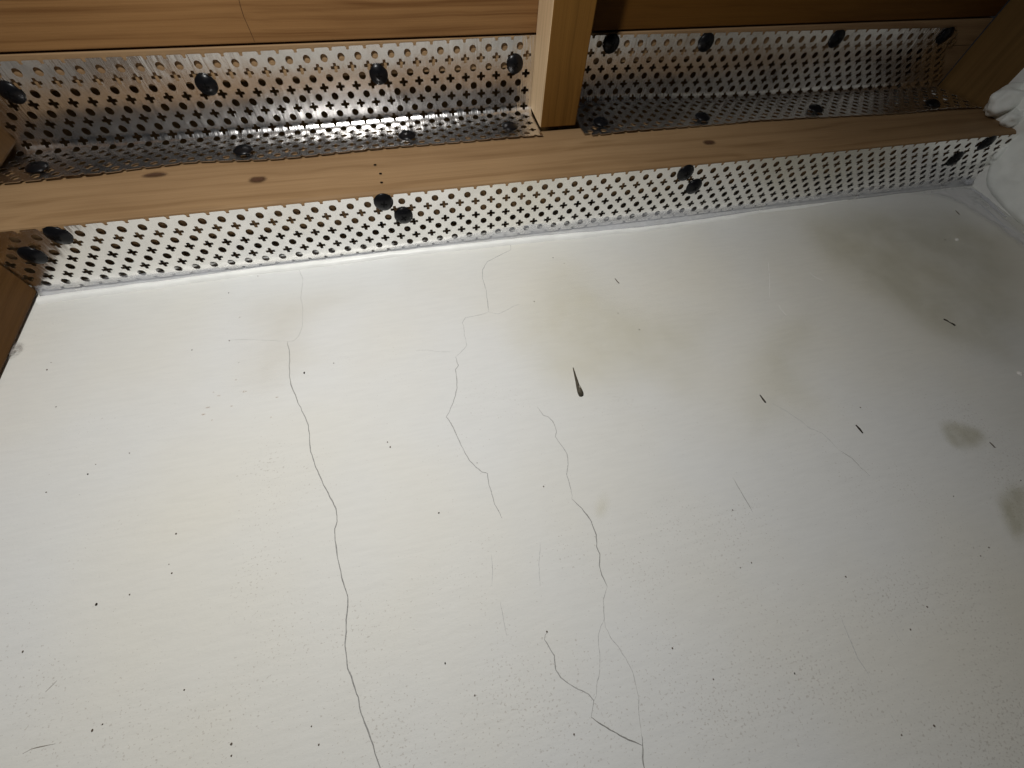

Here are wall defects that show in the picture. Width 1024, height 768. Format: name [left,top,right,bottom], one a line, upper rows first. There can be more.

crack [239,270,381,768]
crack [417,245,516,518]
crack [538,408,645,768]